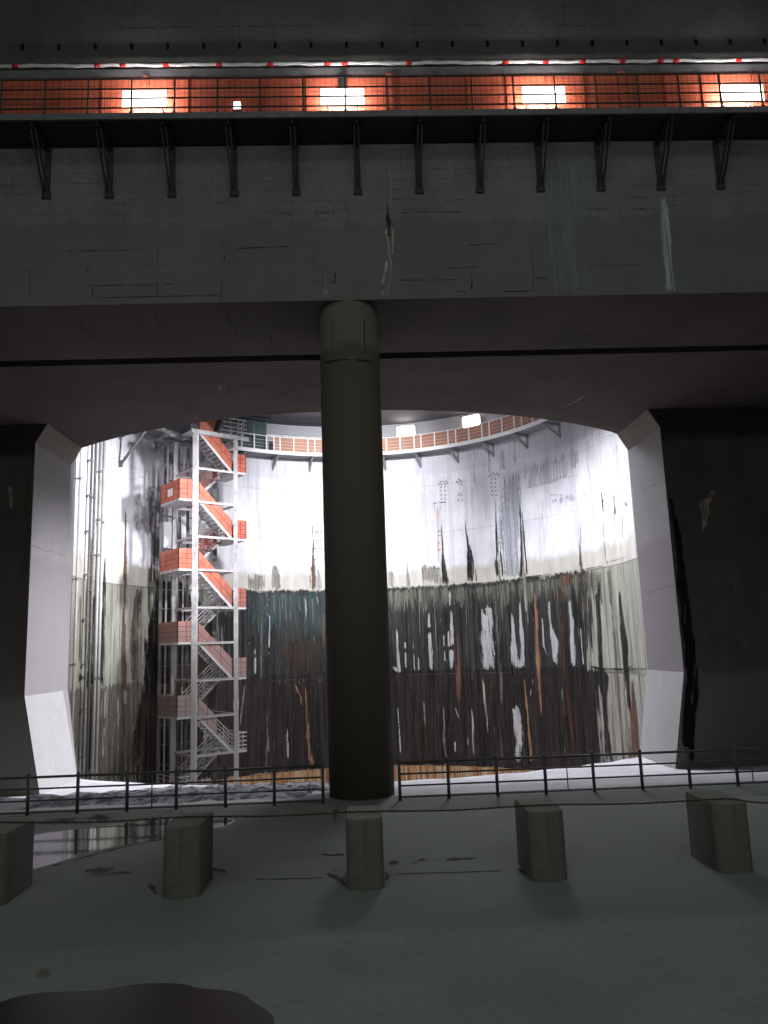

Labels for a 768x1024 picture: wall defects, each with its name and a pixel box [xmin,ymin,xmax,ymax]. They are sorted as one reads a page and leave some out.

damp [660,197,677,291]
corrosion [294,684,314,765]
damp [389,563,469,675]
damp [454,472,530,762]
corrosion [523,594,542,761]
damp [542,590,591,666]
damp [607,570,642,759]